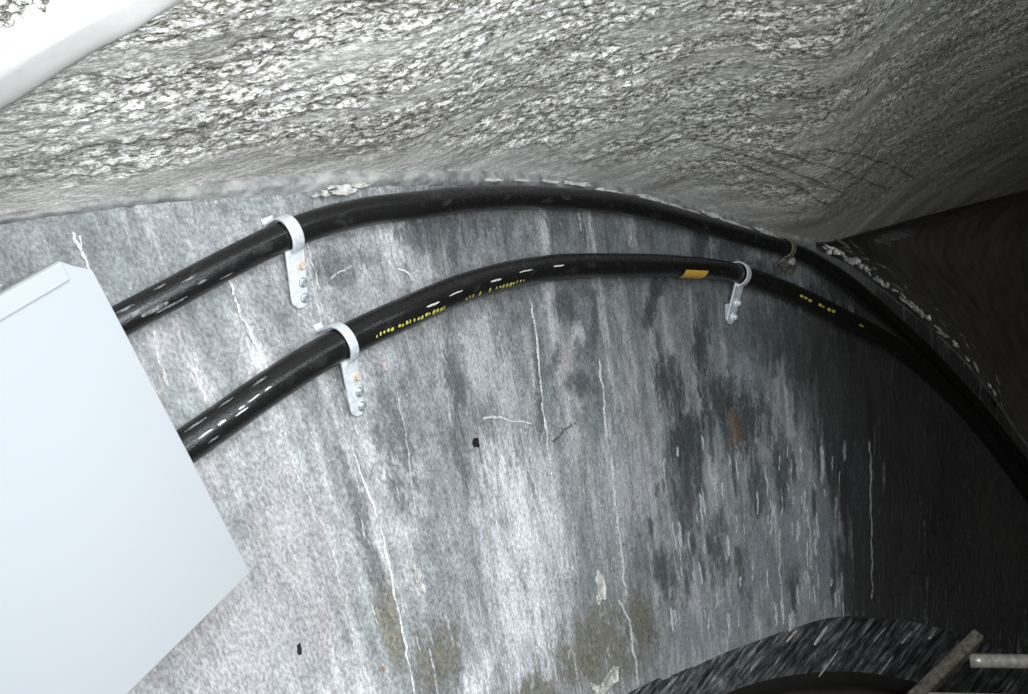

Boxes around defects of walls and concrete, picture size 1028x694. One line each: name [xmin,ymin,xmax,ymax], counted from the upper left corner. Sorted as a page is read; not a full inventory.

leakage [343,273,1028,694]